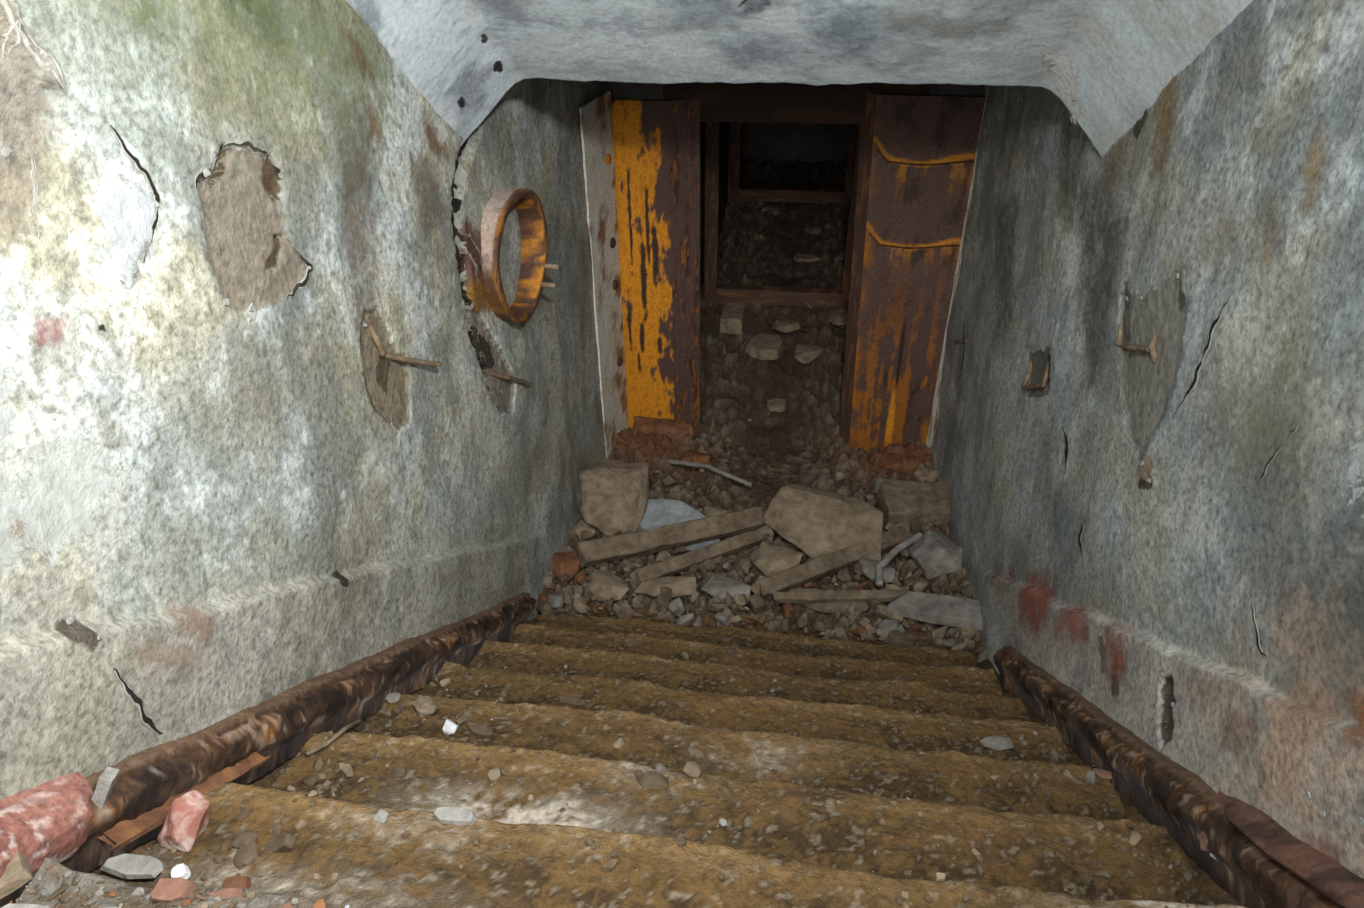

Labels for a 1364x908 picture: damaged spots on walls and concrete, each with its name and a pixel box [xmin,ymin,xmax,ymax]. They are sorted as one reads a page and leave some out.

flaking render [0,52,51,163]
flaking render [198,146,305,311]
flaking render [360,309,441,429]
crack [1174,294,1231,415]
rust [1019,576,1087,641]
crack [113,668,163,735]
flaking render [1160,673,1176,745]